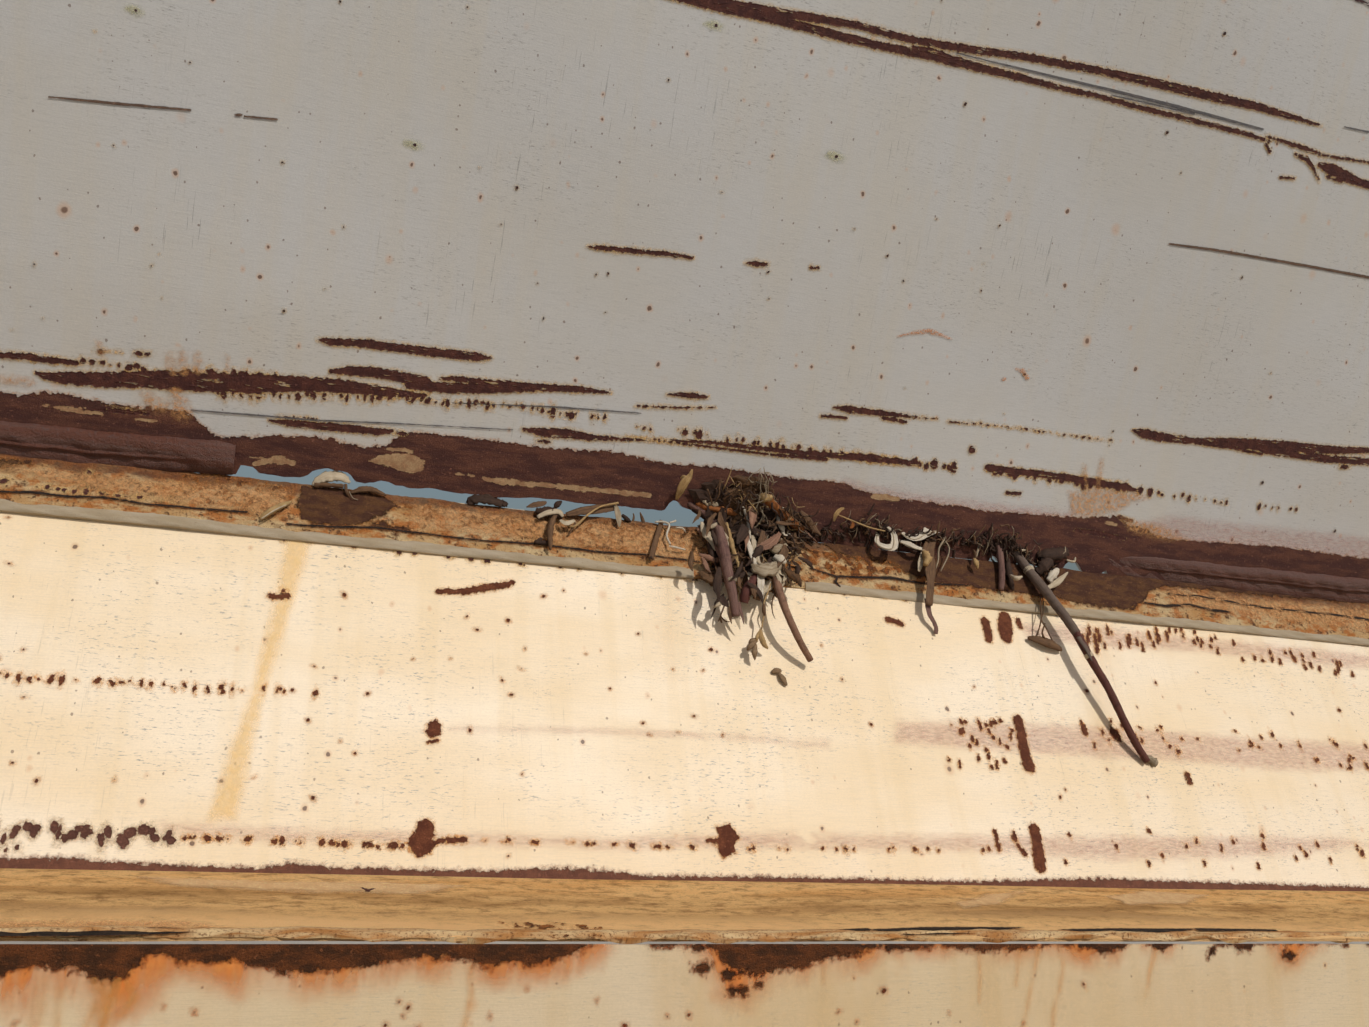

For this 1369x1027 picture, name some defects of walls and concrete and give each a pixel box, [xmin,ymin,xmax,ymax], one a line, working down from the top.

peeling [1318,162,1369,189]
spalling [0,348,155,371]
peeling [268,416,425,473]
peeling [382,395,672,444]
peeling [821,405,1114,446]
corrosion [0,359,1369,628]
peeling [981,612,1023,643]
corrosion [425,719,442,744]
corrosion [0,818,1369,892]
corrosion [0,921,605,1007]
corrosion [649,944,1128,998]
corrosion [1207,944,1349,962]